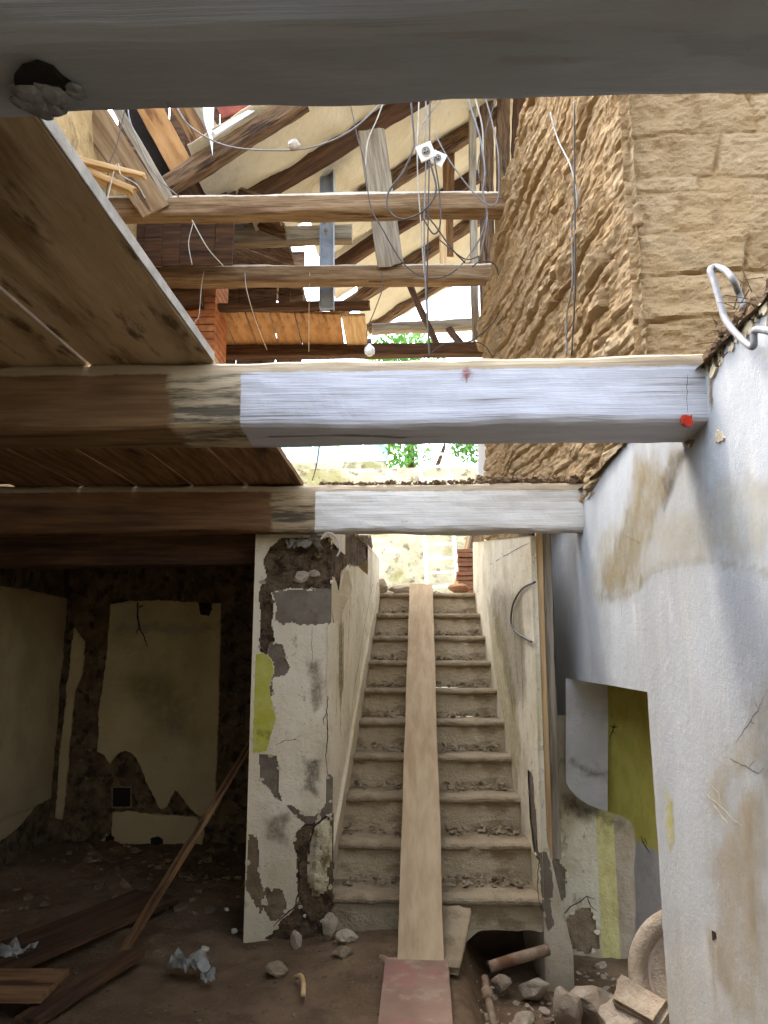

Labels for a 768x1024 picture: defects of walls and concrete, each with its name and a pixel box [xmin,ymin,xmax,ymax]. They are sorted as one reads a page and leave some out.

leakage [603,462,670,590]
spalling [244,534,373,940]
crack [731,691,767,774]
crack [273,813,330,927]
peeling [527,771,600,954]